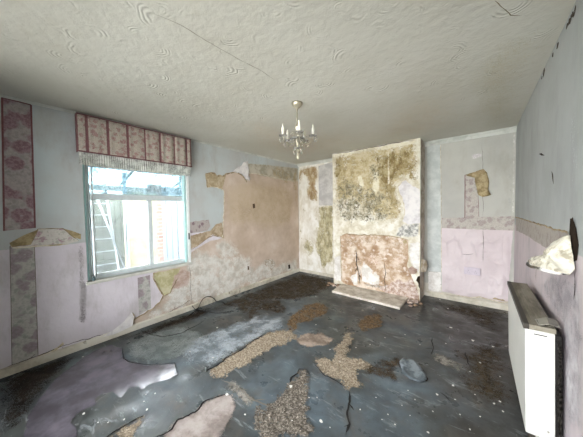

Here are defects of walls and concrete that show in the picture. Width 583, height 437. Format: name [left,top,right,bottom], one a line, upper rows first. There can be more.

crack [155,14,273,79]
damp [236,120,418,270]
flaking render [133,161,299,324]
flaking render [334,233,420,301]
spalling [569,217,579,262]
crack [344,392,354,433]